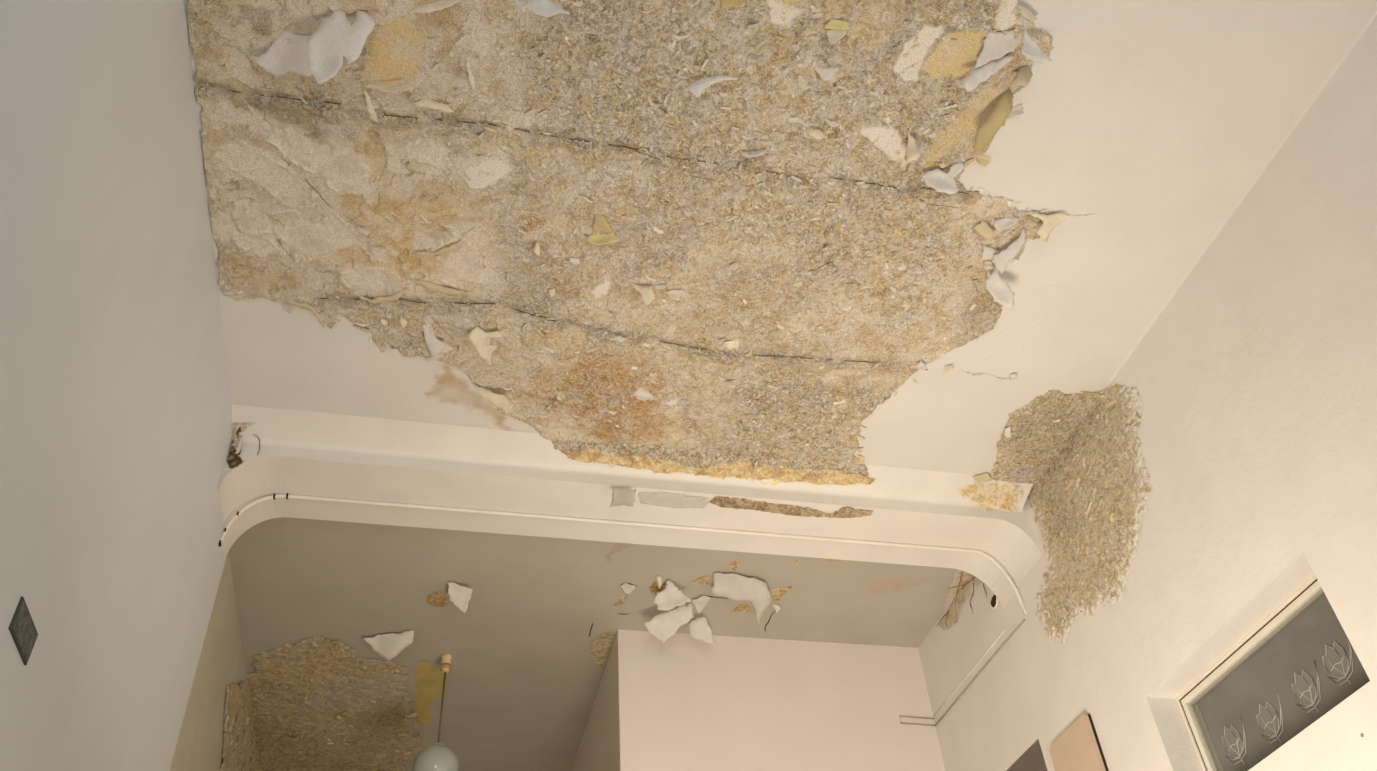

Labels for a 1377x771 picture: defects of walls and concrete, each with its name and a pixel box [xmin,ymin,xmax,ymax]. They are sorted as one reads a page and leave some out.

crack [228,89,341,105]
crack [384,114,779,181]
crack [833,178,969,208]
peeling [186,0,1069,518]
crack [398,299,556,329]
peeling [955,383,1153,645]
spalling [427,582,472,613]
peeling [614,561,792,645]
peeling [220,630,424,771]